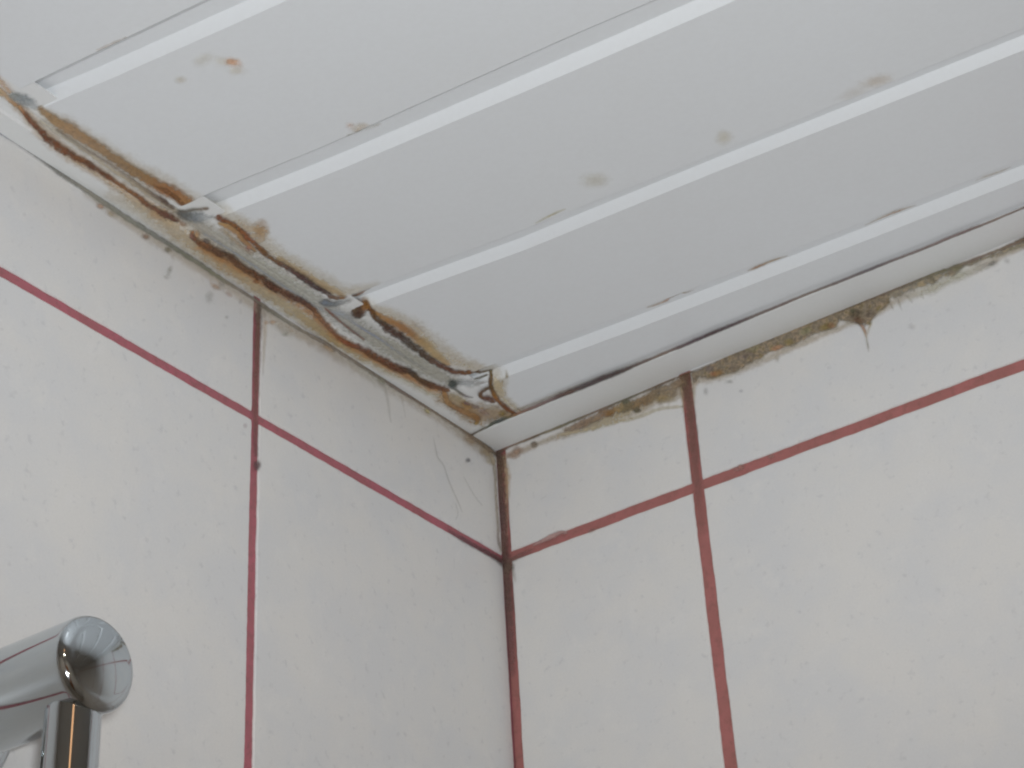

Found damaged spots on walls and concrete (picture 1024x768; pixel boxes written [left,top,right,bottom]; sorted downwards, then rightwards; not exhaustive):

rust [0,80,519,436]
water stain [34,155,1024,456]